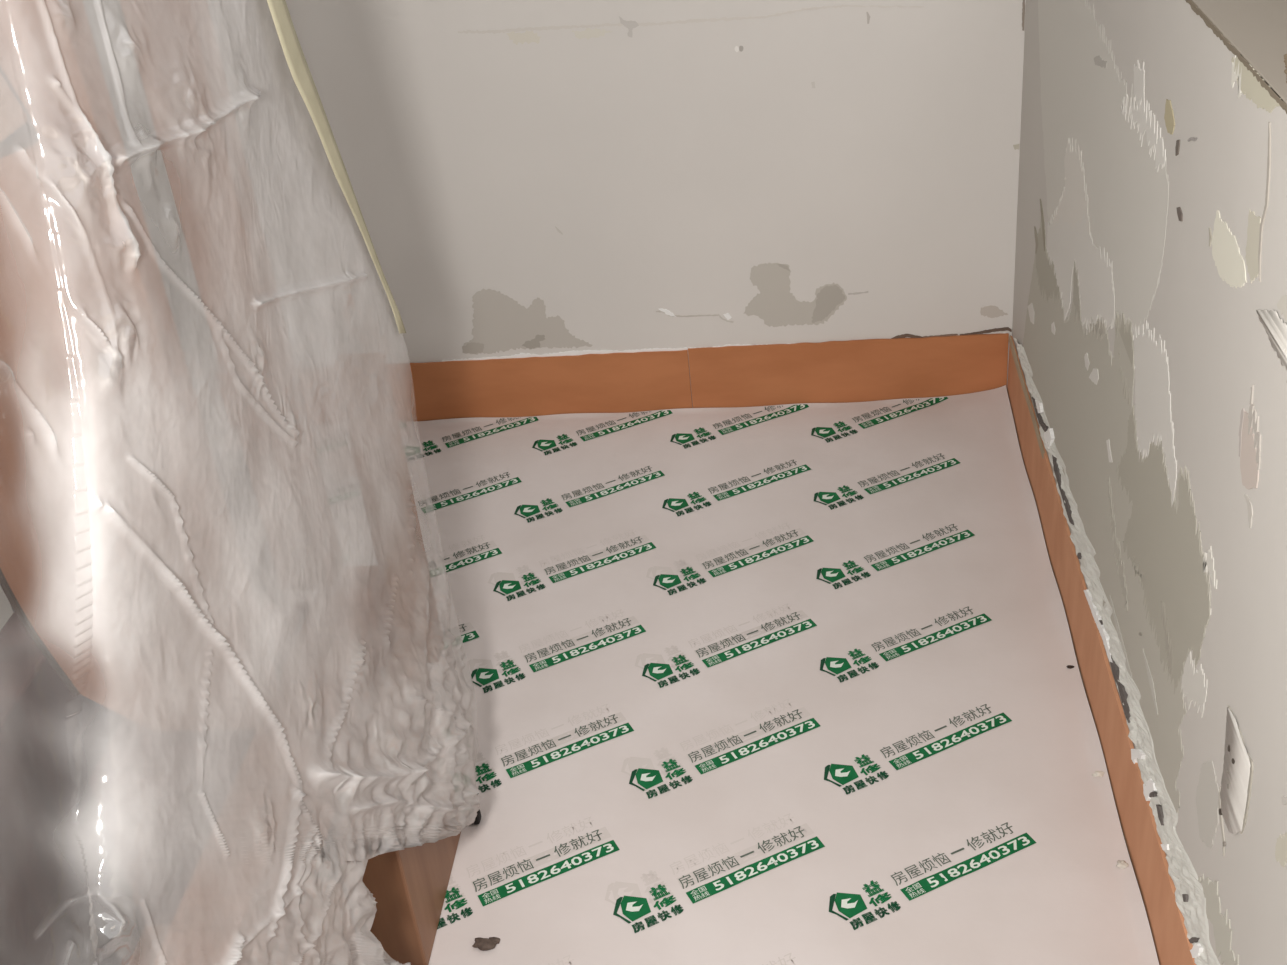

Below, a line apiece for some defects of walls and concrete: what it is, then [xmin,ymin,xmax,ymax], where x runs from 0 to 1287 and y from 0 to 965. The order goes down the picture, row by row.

flaking render [463,288,592,355]
flaking render [723,262,847,327]
flaking render [1013,219,1220,965]